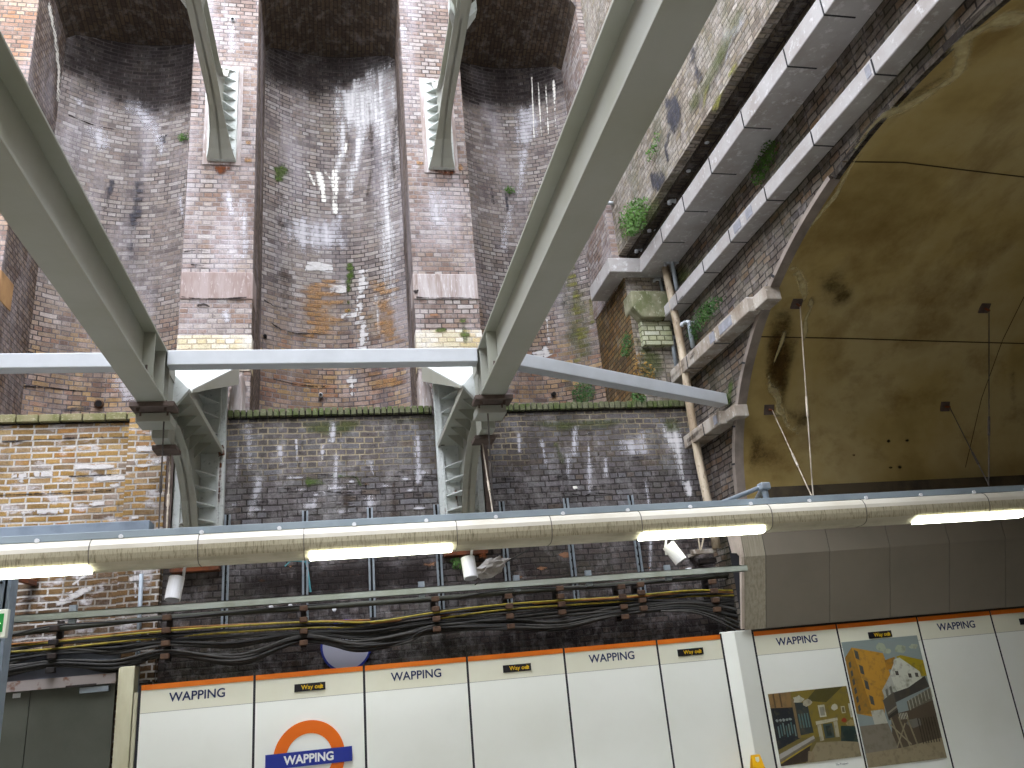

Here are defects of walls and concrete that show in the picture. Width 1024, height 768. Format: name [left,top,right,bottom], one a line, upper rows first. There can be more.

water stain [650,95,682,191]
water stain [129,181,142,228]
water stain [279,72,400,349]
water stain [768,314,807,430]
water stain [664,427,699,496]
water stain [25,578,39,614]